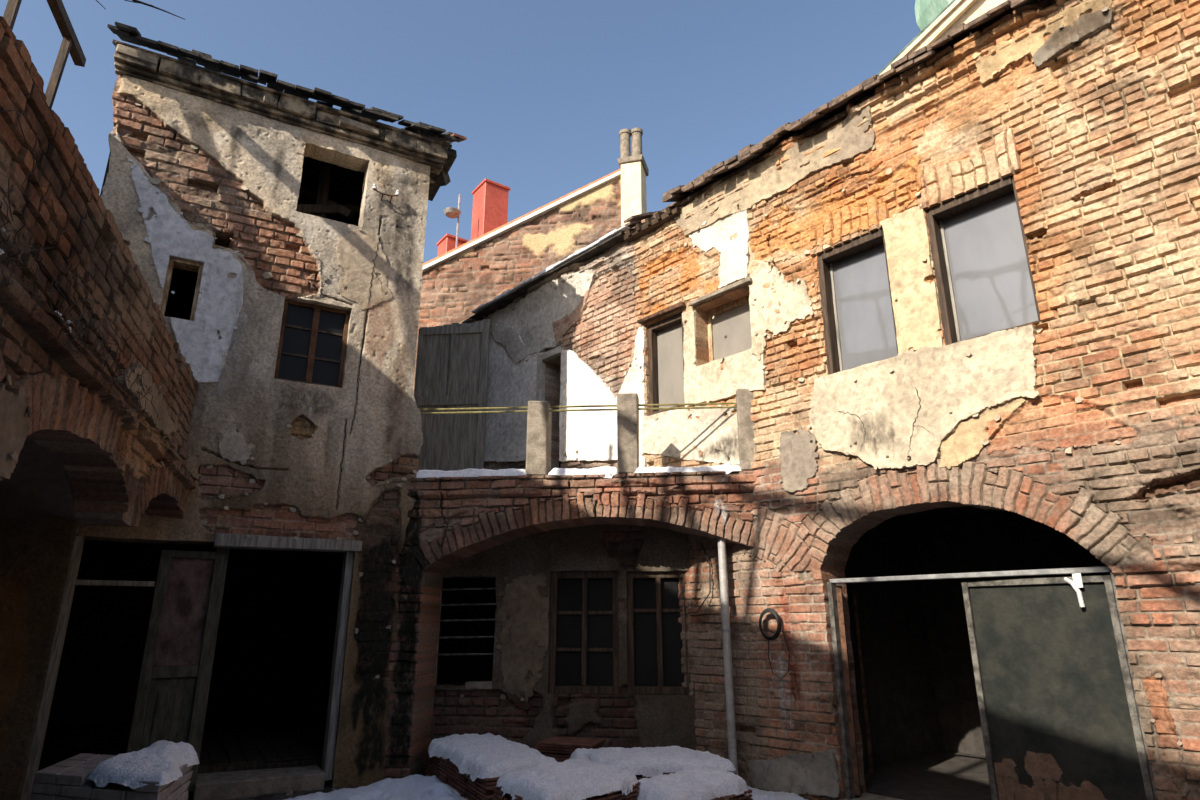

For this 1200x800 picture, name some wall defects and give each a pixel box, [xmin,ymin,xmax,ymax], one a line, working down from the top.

flaking render [0,374,31,479]
spalling [114,92,393,383]
spalling [287,413,318,440]
spalling [197,424,419,680]
crack [314,218,384,509]
flaking render [479,105,1139,510]